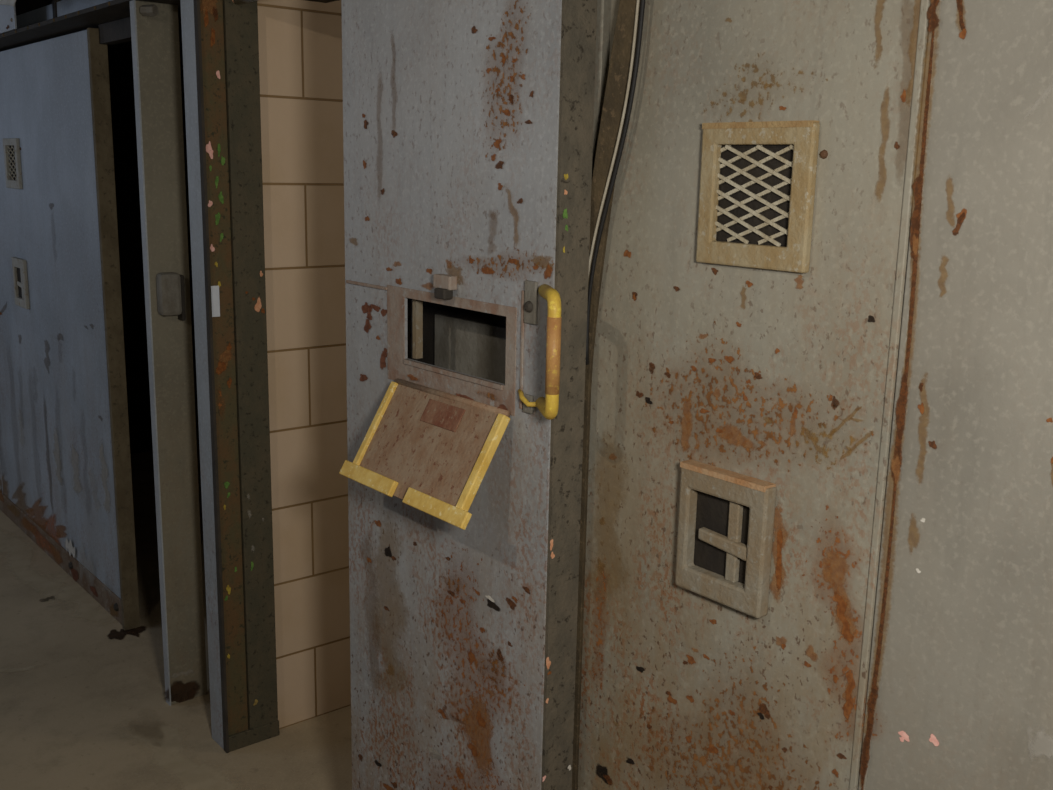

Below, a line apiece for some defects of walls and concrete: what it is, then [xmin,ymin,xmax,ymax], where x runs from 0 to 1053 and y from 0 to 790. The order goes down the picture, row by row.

corrosion [956,0,966,39]
corrosion [479,0,534,169]
corrosion [704,54,813,122]
corrosion [446,247,554,281]
corrosion [952,209,967,235]
corrosion [636,321,874,472]
corrosion [802,0,939,790]
corrosion [22,500,79,581]
corrosion [769,506,788,599]
corrosion [420,548,530,790]
corrosion [627,642,847,790]